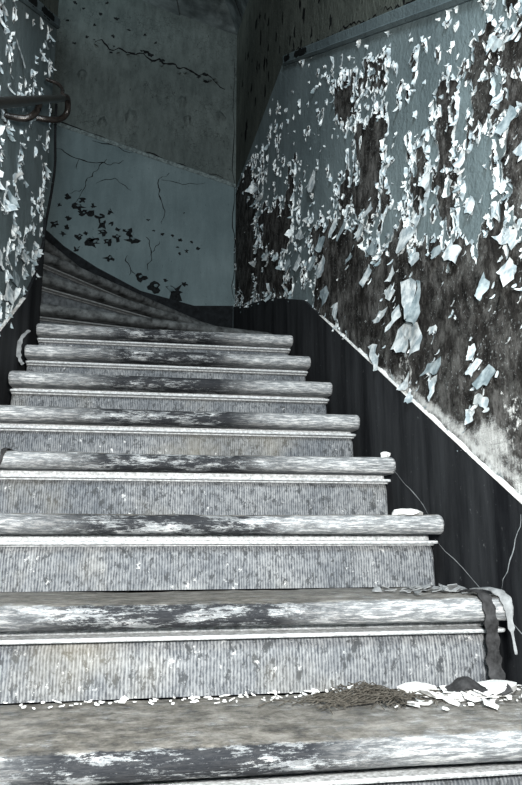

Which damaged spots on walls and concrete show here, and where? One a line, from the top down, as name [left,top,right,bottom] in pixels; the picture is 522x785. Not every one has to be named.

peeling [0,0,57,96]
peeling [0,104,141,328]
crack [57,39,235,298]
peeling [233,0,522,495]
damp [389,354,522,495]